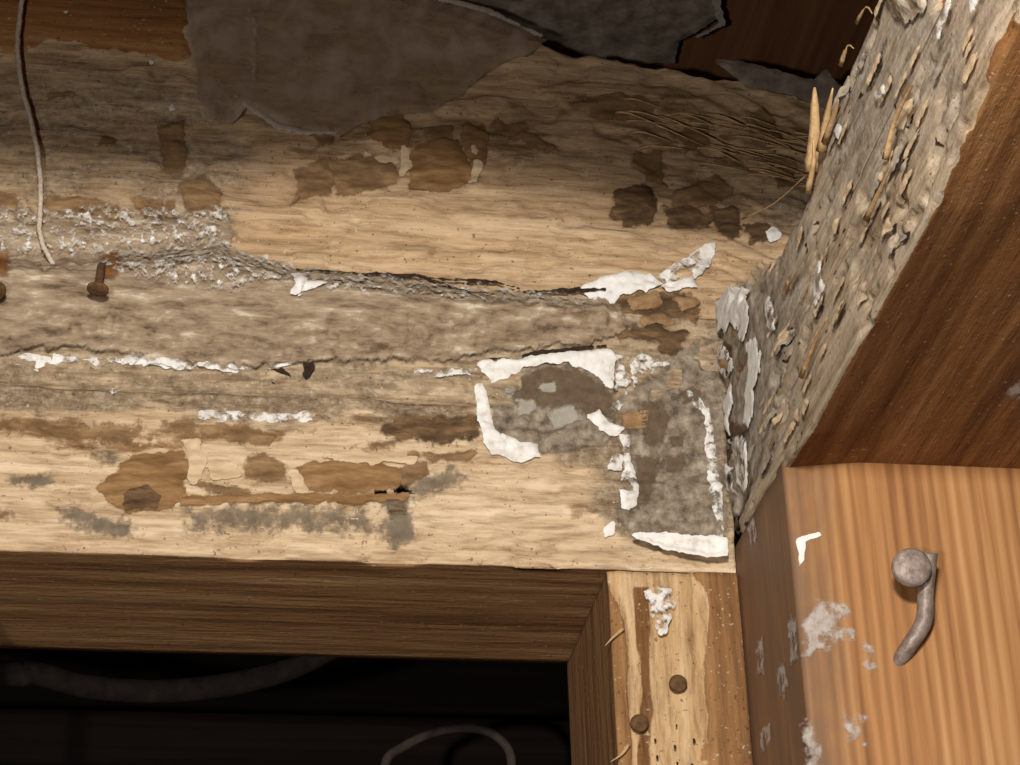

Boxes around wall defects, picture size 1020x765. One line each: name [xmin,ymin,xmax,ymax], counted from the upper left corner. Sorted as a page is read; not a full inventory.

peeling [857,0,928,256]
peeling [293,110,556,199]
corrosion [0,253,10,275]
corrosion [102,251,121,277]
crack [296,269,606,294]
water stain [812,260,825,306]
peeling [96,150,782,514]
water stain [414,368,477,377]
crack [489,345,607,359]
water stain [363,414,480,450]
water stain [491,260,782,536]
peeling [632,277,868,558]